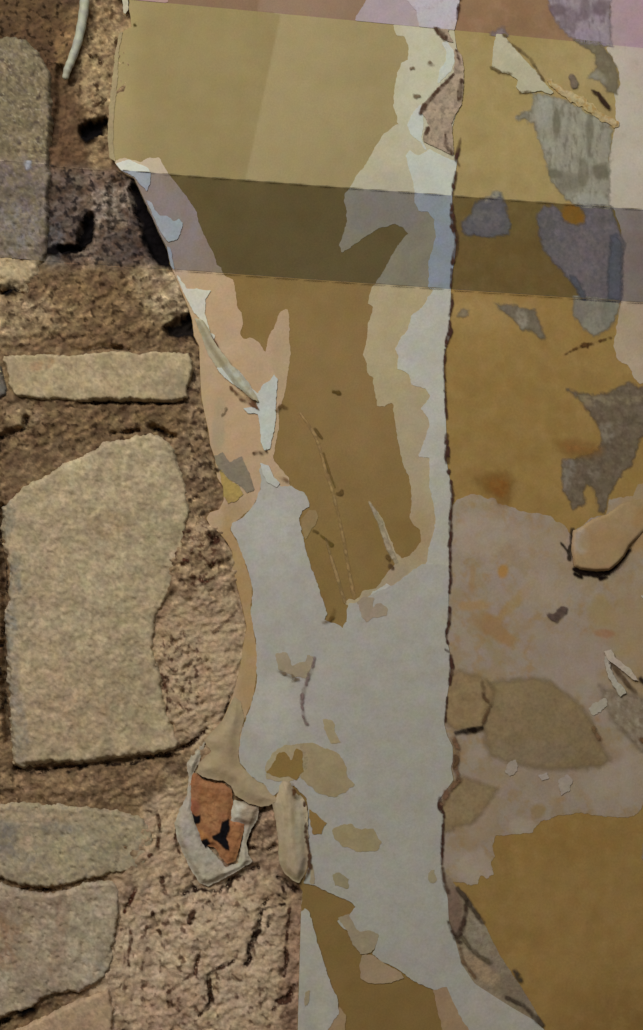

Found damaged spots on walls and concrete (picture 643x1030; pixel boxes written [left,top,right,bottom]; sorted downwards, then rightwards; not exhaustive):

peeling [115,157,544,1030]
crack [437,800,445,864]
crack [443,148,490,769]
peeling [339,0,643,885]
crack [560,528,631,580]